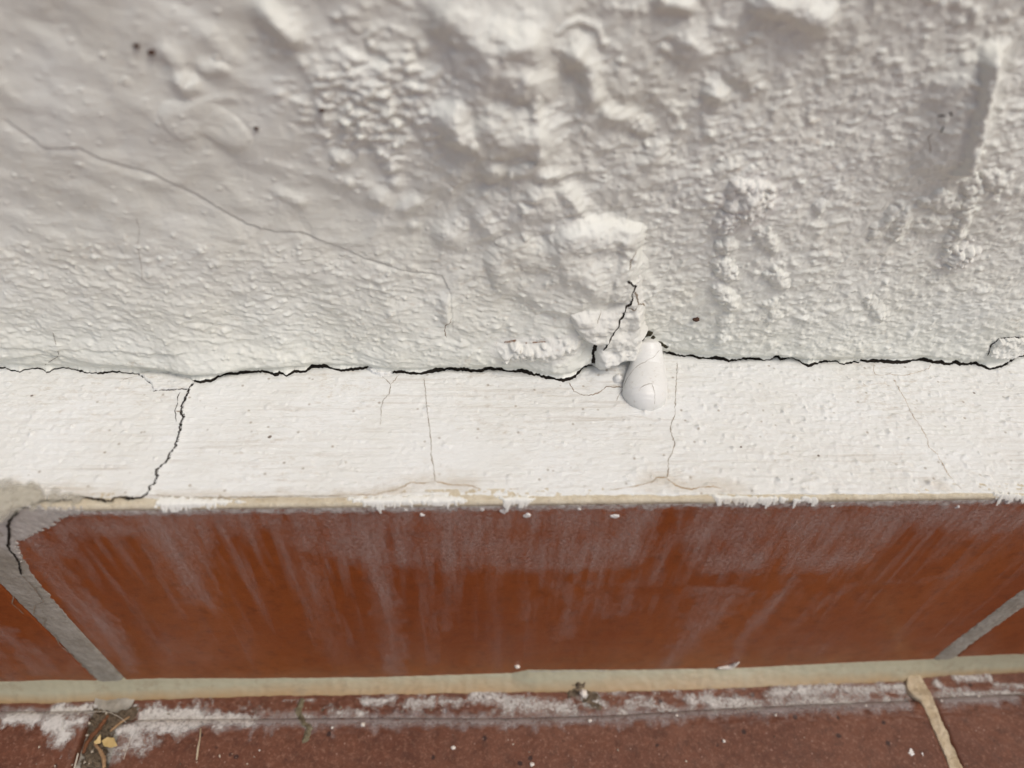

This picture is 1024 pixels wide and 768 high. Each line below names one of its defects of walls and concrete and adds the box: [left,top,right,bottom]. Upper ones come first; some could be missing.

crack [0,250,1024,679]
efflorescence [72,500,998,515]